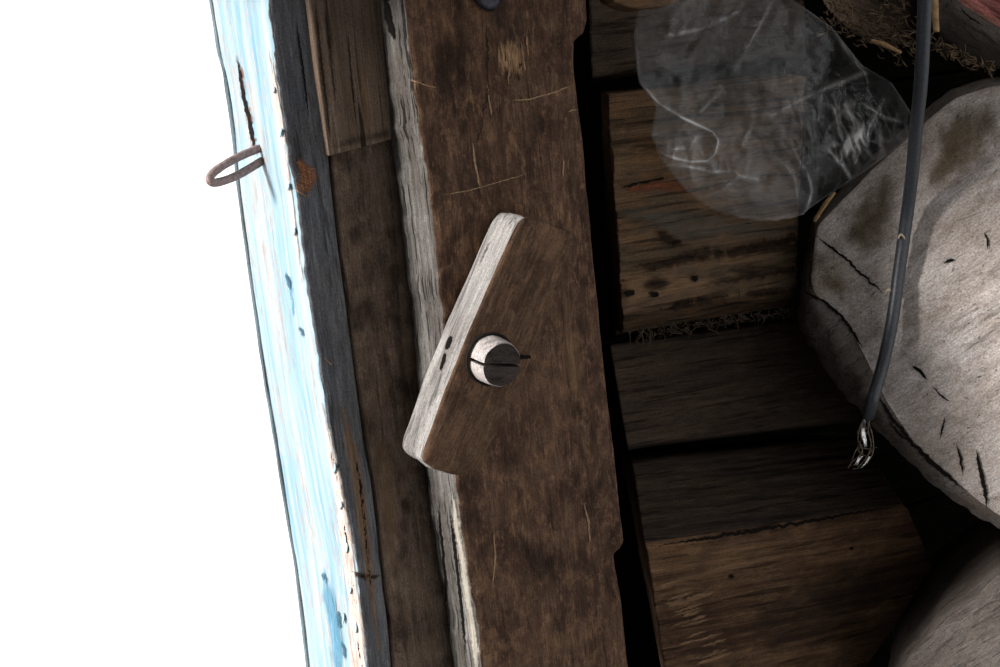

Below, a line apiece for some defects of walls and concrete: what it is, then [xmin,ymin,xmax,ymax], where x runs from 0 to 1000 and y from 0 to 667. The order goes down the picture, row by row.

crack [817,236,882,293]
crack [660,504,902,547]